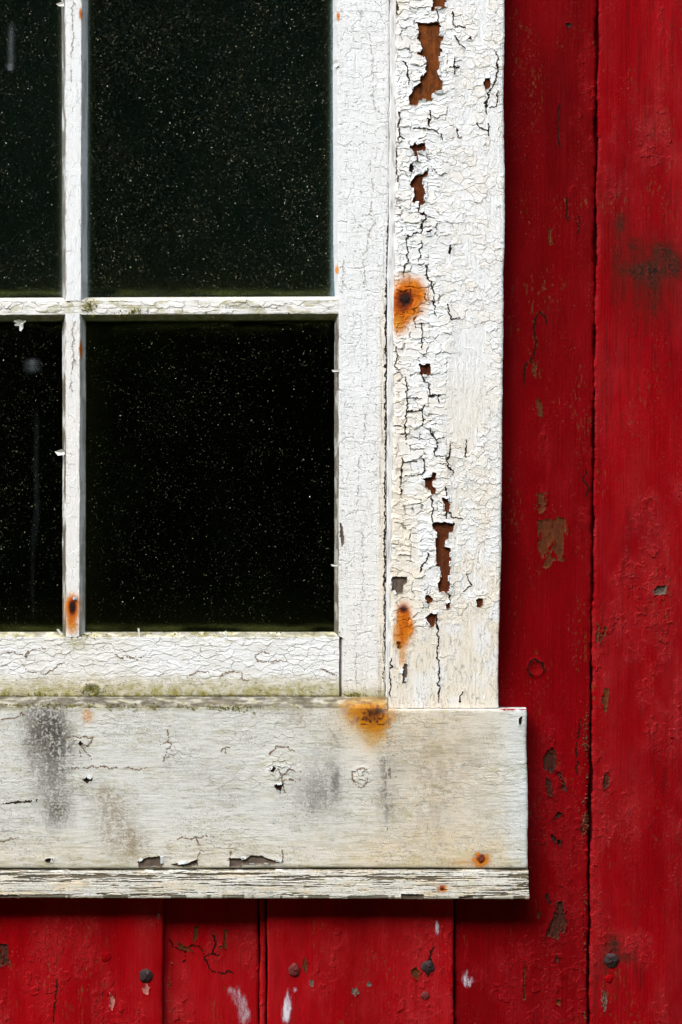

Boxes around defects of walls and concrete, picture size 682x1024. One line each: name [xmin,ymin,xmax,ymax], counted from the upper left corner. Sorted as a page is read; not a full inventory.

peeling [408,0,448,105]
crack [436,10,466,75]
crack [476,50,499,136]
peeling [409,139,432,237]
corrosion [394,277,426,330]
crack [320,25,467,697]
peeling [390,576,407,595]
corrosion [396,604,414,648]
peeling [419,472,455,627]
crack [435,573,472,703]
damp [29,704,68,774]
corrosion [345,704,392,739]